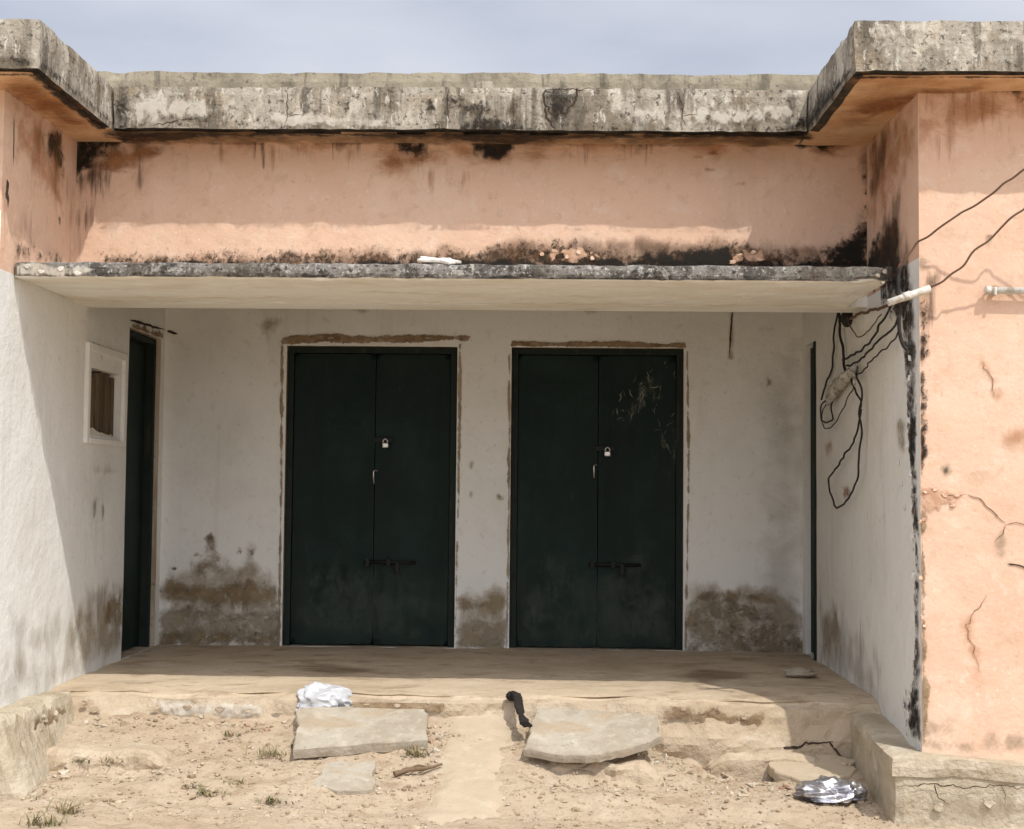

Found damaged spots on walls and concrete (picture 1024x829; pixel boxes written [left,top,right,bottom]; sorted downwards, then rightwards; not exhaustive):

damp [979,32,1024,41]
damp [0,24,943,187]
damp [103,218,911,327]
crack [922,493,1024,568]
damp [71,596,122,658]
damp [159,563,280,646]
damp [457,591,506,649]
damp [687,590,803,652]
crack [965,597,986,665]
crack [899,783,1024,804]